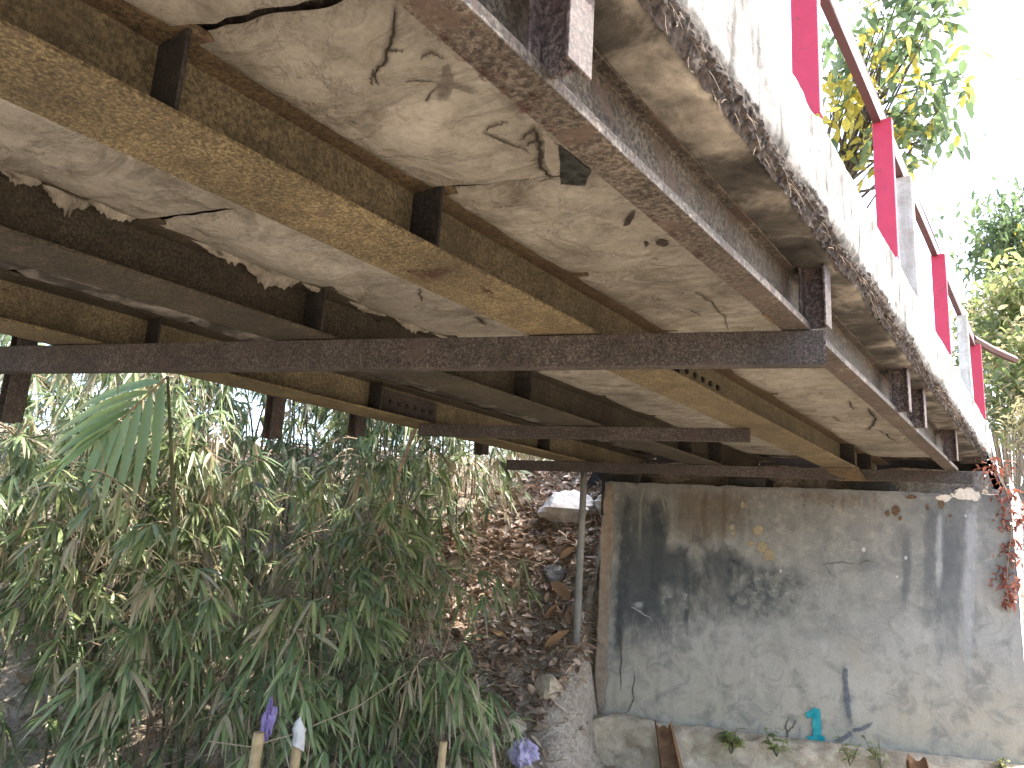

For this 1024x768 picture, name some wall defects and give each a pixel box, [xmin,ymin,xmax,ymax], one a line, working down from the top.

crack [369,6,403,86]
crack [484,122,553,181]
peeling [0,166,135,222]
peeling [192,240,320,293]
spalling [885,495,916,520]
spalling [926,487,981,517]
water stain [595,484,858,710]
water stain [904,519,941,584]
water stain [963,514,976,629]